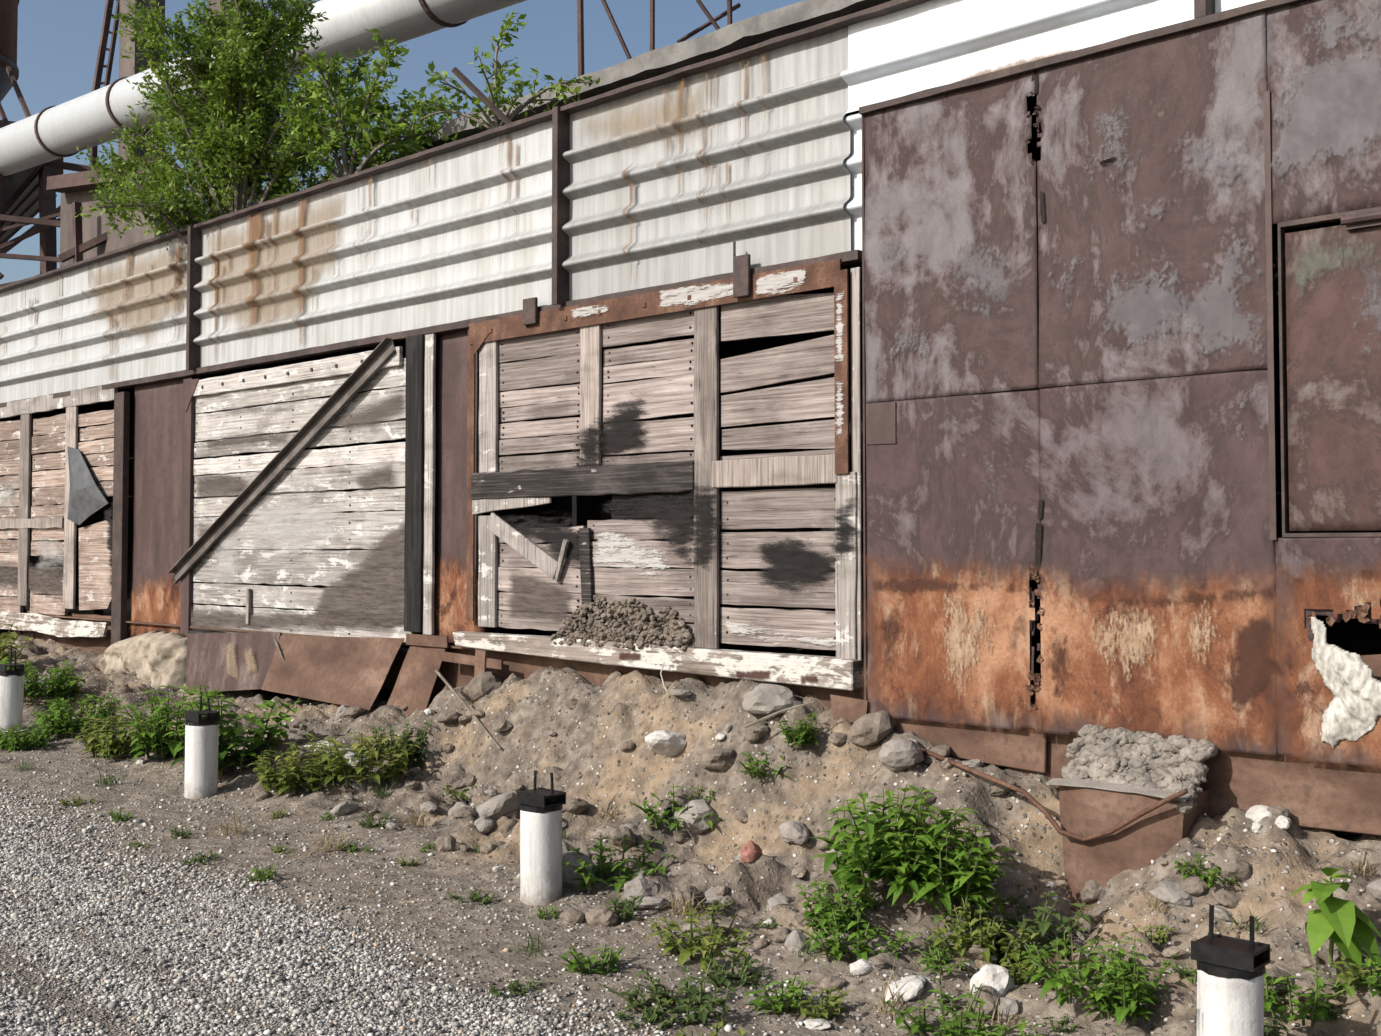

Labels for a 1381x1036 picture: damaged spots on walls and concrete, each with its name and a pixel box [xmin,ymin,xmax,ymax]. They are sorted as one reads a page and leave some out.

peeling [1271,9,1381,175]
rust [499,137,518,200]
rust [207,199,339,344]
peeling [571,305,608,318]
peeling [660,282,733,307]
peeling [756,270,806,294]
peeling [1106,240,1259,354]
rust [129,581,187,636]
rust [434,561,478,638]
crack [1026,499,1050,723]
peeling [1309,602,1381,643]
rust [869,564,1381,763]